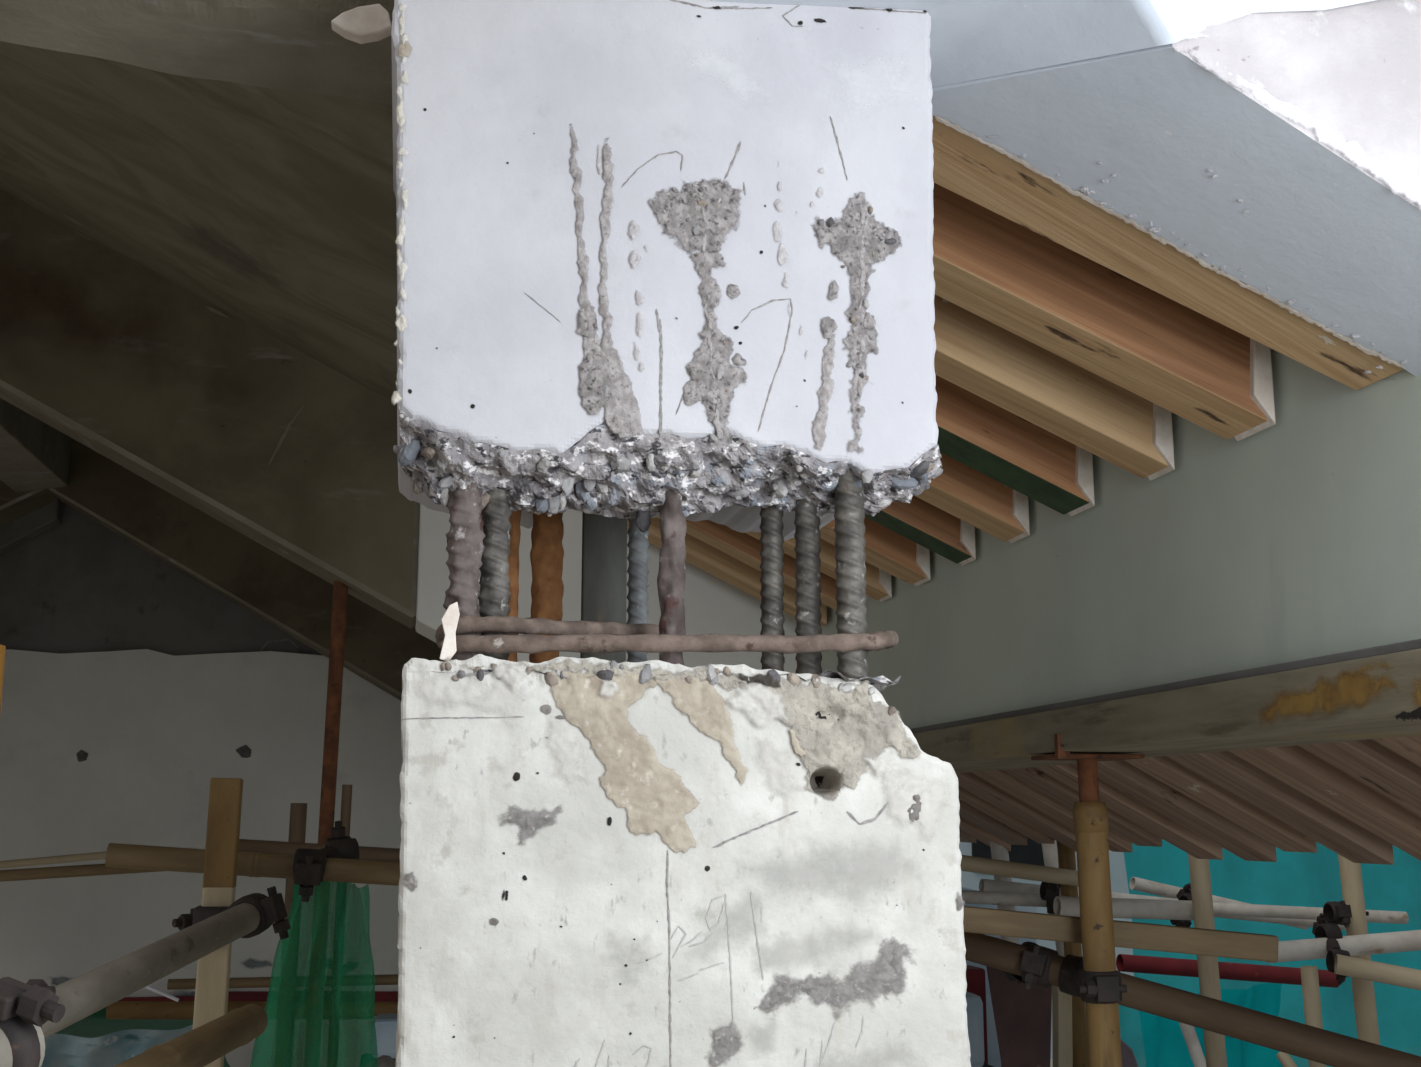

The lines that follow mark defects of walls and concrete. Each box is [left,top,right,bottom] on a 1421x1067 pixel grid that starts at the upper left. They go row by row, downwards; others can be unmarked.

spalling [394,4,412,364]
peeling [628,220,647,268]
peeling [634,291,644,371]
peeling [727,284,740,299]
peeling [821,280,839,339]
spalling [392,306,943,533]
spalling [441,658,921,800]
crack [665,850,673,1067]